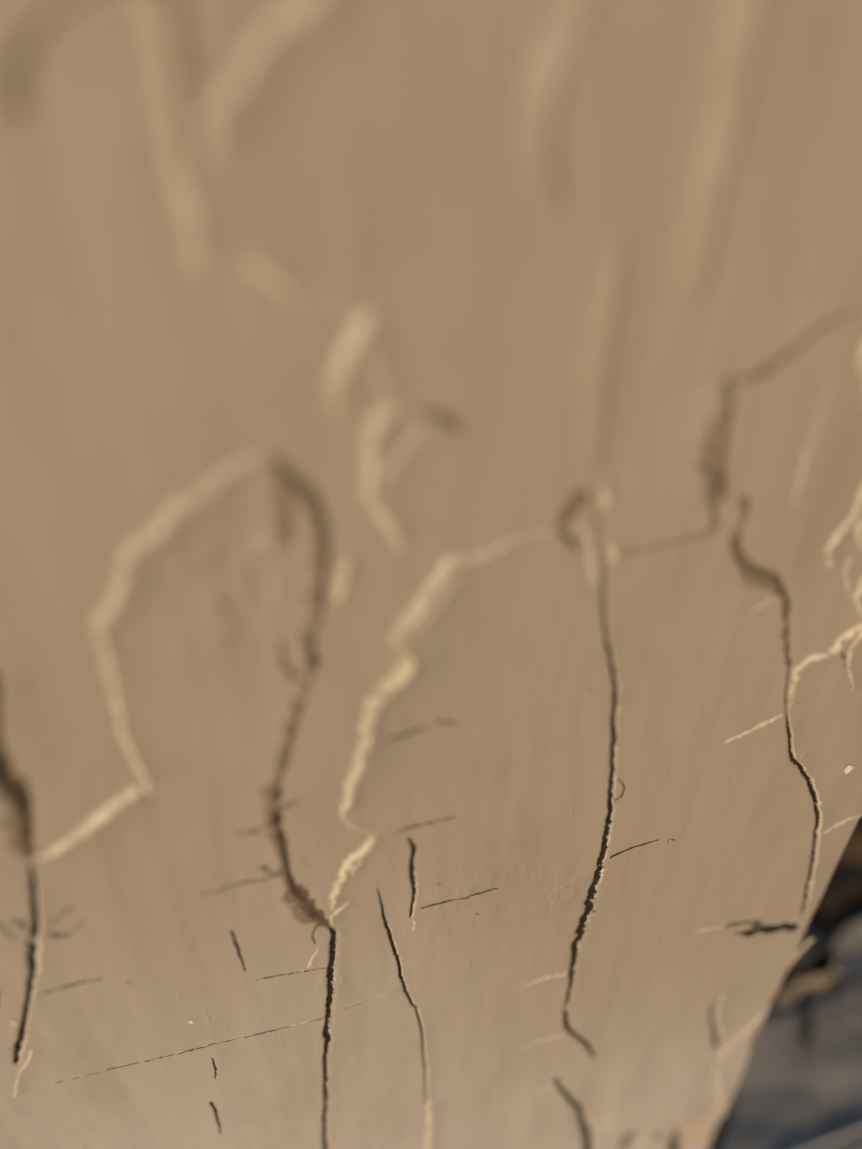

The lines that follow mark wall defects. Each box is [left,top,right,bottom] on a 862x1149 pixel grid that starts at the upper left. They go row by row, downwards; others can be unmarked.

crack [0,721,102,1098]
peeling [36,452,268,859]
crack [52,452,498,1149]
peeling [329,487,616,927]
crack [554,1078,597,1149]
crack [562,554,658,1058]
crack [696,311,853,937]
peeling [788,490,862,710]